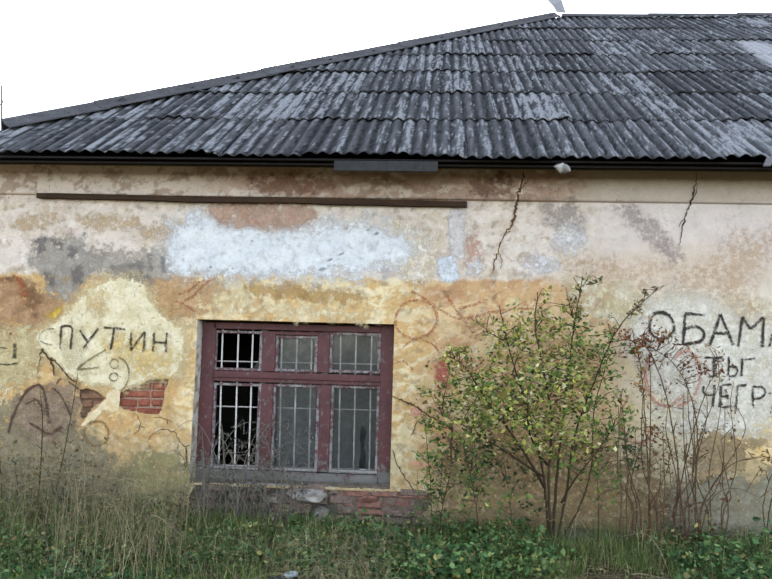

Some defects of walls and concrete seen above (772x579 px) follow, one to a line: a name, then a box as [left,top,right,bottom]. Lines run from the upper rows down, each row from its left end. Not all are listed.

crack [491,173,528,274]
crack [679,173,698,243]
flaking render [0,270,195,427]